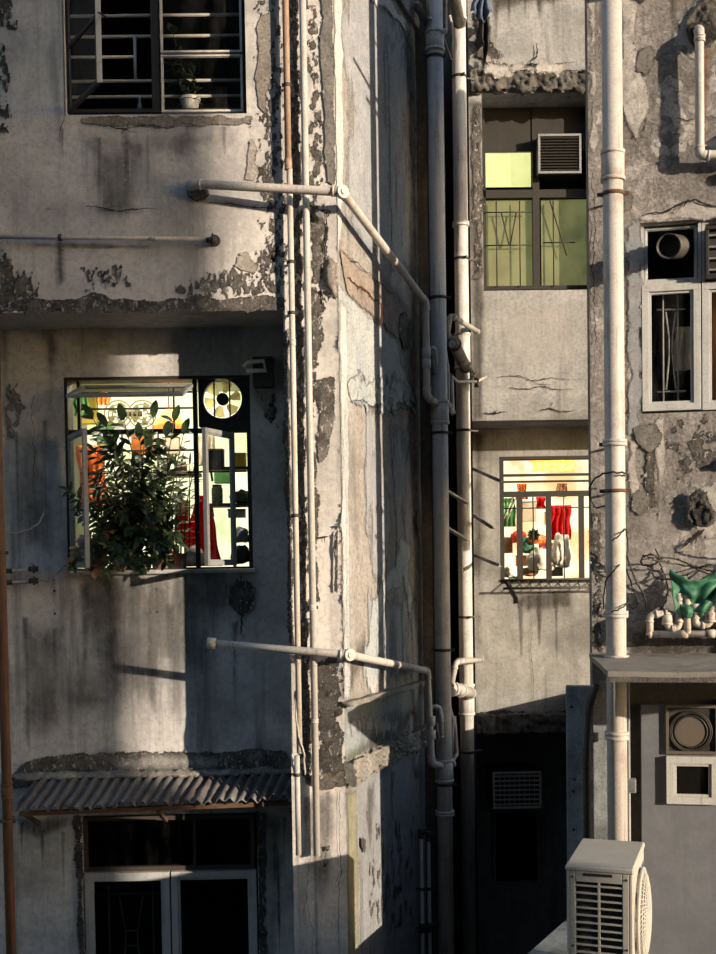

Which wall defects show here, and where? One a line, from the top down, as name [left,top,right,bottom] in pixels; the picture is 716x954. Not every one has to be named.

peeling [472,15,575,79]
peeling [587,0,601,152]
peeling [622,0,716,168]
spalling [623,193,633,212]
crack [647,199,716,214]
peeling [625,201,716,595]
peeling [0,0,419,954]
crack [680,529,705,550]
water stain [84,575,242,691]